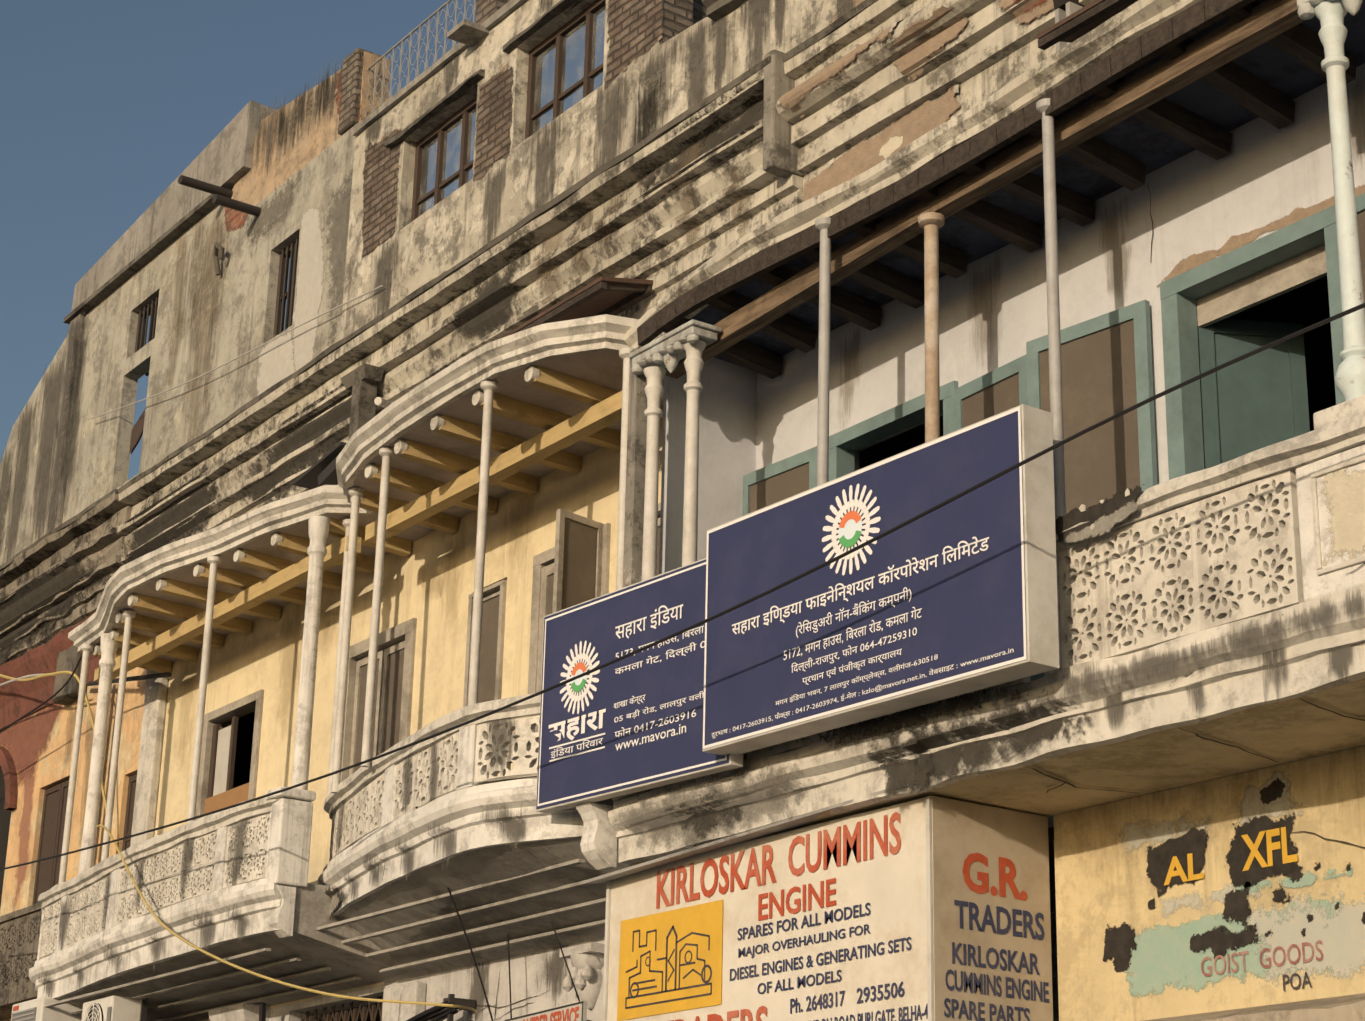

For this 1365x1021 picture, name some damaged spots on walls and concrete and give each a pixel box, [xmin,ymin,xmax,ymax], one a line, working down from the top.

leakage [594,0,784,211]
spalling [777,6,968,118]
spalling [802,84,960,201]
flaking render [224,207,247,231]
leakage [451,161,520,350]
spalling [1157,196,1335,287]
leakage [0,313,84,562]
leakage [236,381,352,506]
leakage [124,459,221,562]
leakage [814,591,1361,800]
leakage [619,764,803,852]
crack [1280,831,1365,849]